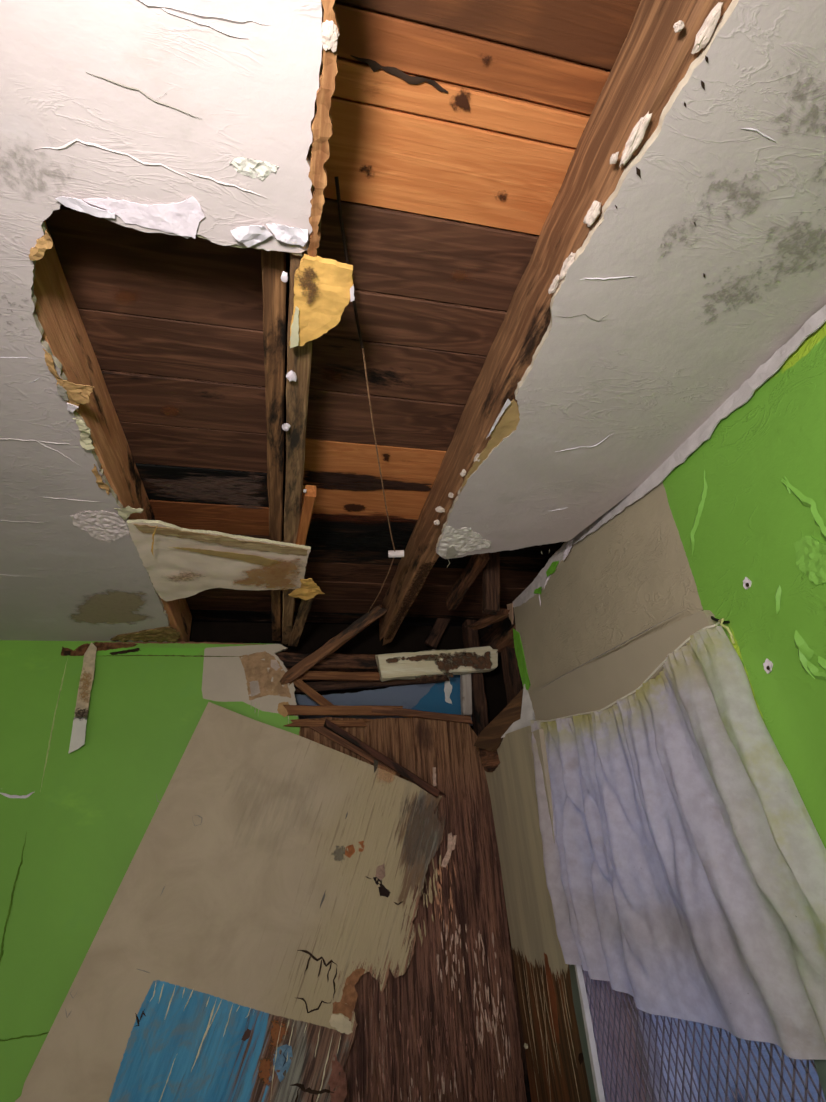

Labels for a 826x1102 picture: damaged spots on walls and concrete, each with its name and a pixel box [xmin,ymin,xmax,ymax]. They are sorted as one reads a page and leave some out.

crack [127,0,270,39]
peeling [55,196,205,238]
peeling [230,224,308,247]
spalling [71,510,131,542]
peeling [438,525,491,567]
damp [71,591,148,624]
spalling [507,539,573,690]
spalling [763,658,773,674]
crack [0,832,27,962]
crack [297,950,338,1013]
crack [0,1032,49,1041]